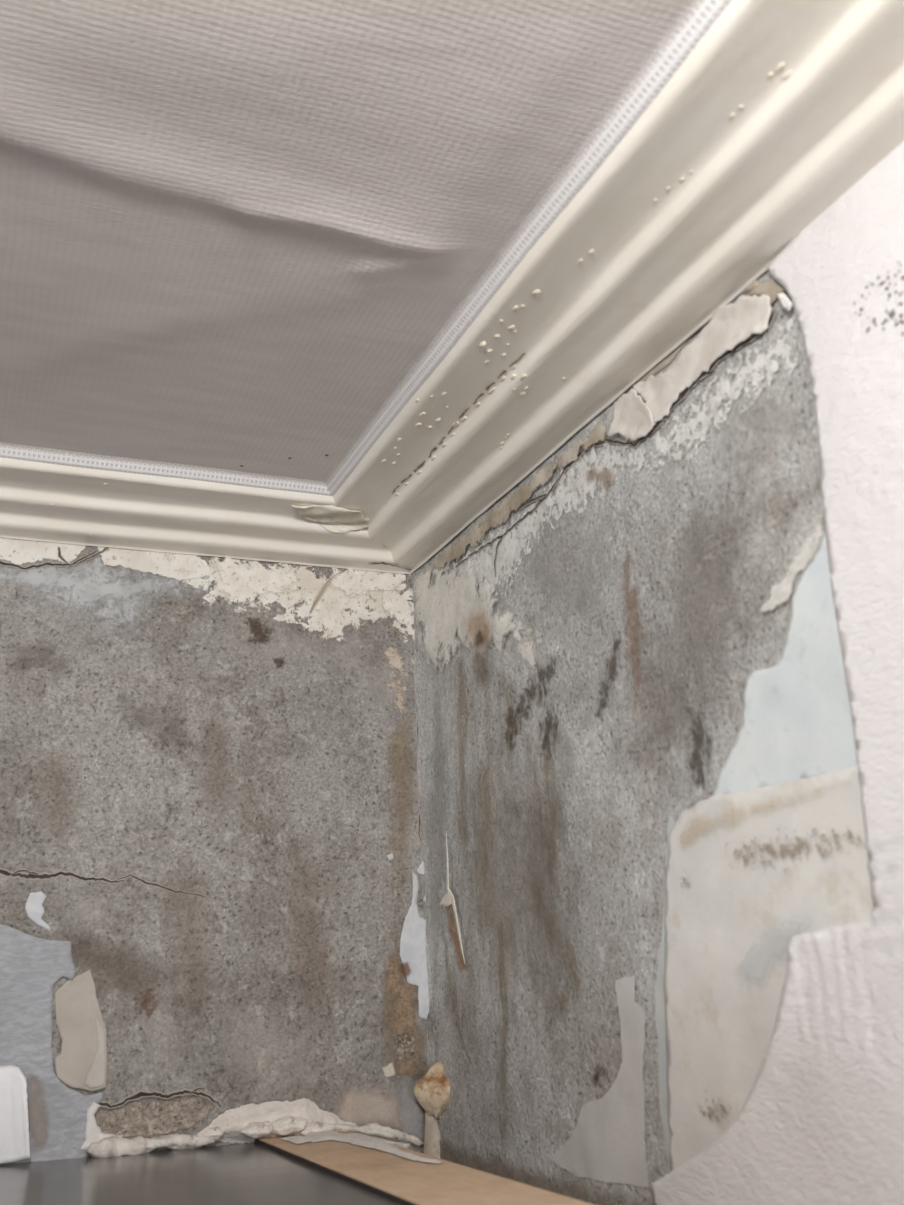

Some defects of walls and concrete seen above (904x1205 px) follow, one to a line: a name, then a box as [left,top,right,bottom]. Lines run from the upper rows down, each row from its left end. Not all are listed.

water stain [854,261,904,335]
peeling [433,279,793,571]
crack [0,547,109,571]
peeling [0,534,415,646]
water stain [505,659,558,760]
water stain [596,639,621,719]
water stain [690,713,711,786]
crack [0,868,205,898]
peeling [423,830,465,967]
water stain [725,827,862,871]
spalling [95,1096,214,1137]
crack [98,1087,222,1109]